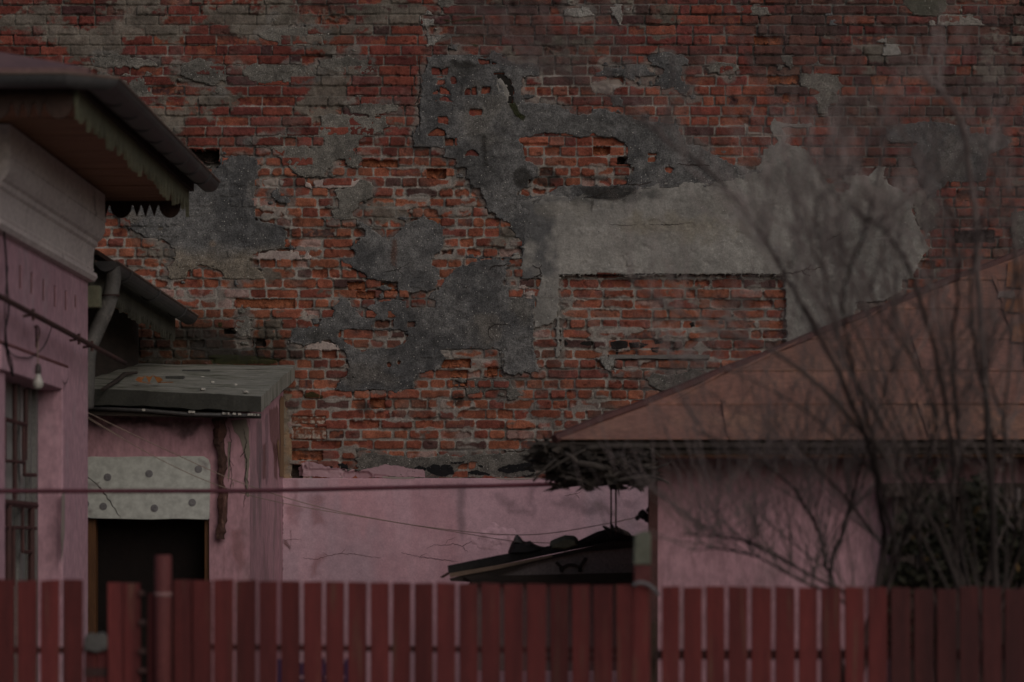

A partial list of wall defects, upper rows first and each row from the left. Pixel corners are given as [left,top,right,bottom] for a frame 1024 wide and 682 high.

flaking render [90,53,159,97]
flaking render [172,18,375,94]
flaking render [928,9,984,28]
flaking render [107,95,399,347]
flaking render [288,0,932,409]
flaking render [283,394,538,478]
crack [284,539,472,562]